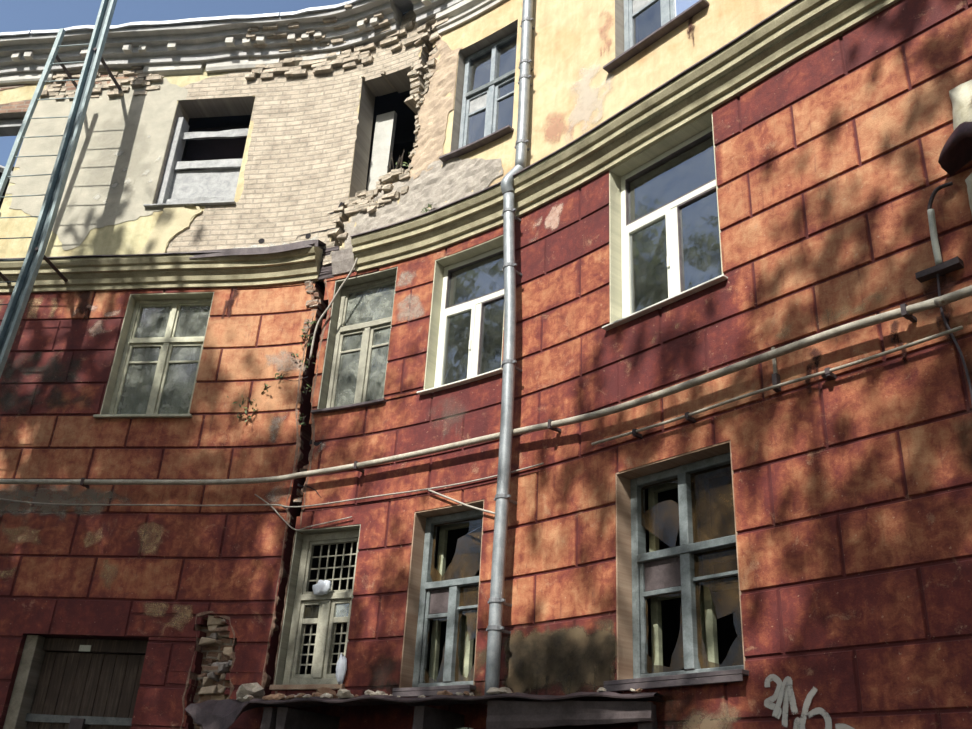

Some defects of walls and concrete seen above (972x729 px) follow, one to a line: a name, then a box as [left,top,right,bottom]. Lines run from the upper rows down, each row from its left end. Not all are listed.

flaking render [0,75,79,218]
flaking render [52,9,503,254]
crack [404,25,440,115]
crack [261,202,356,694]
spalling [146,603,237,729]
damp [503,620,617,695]